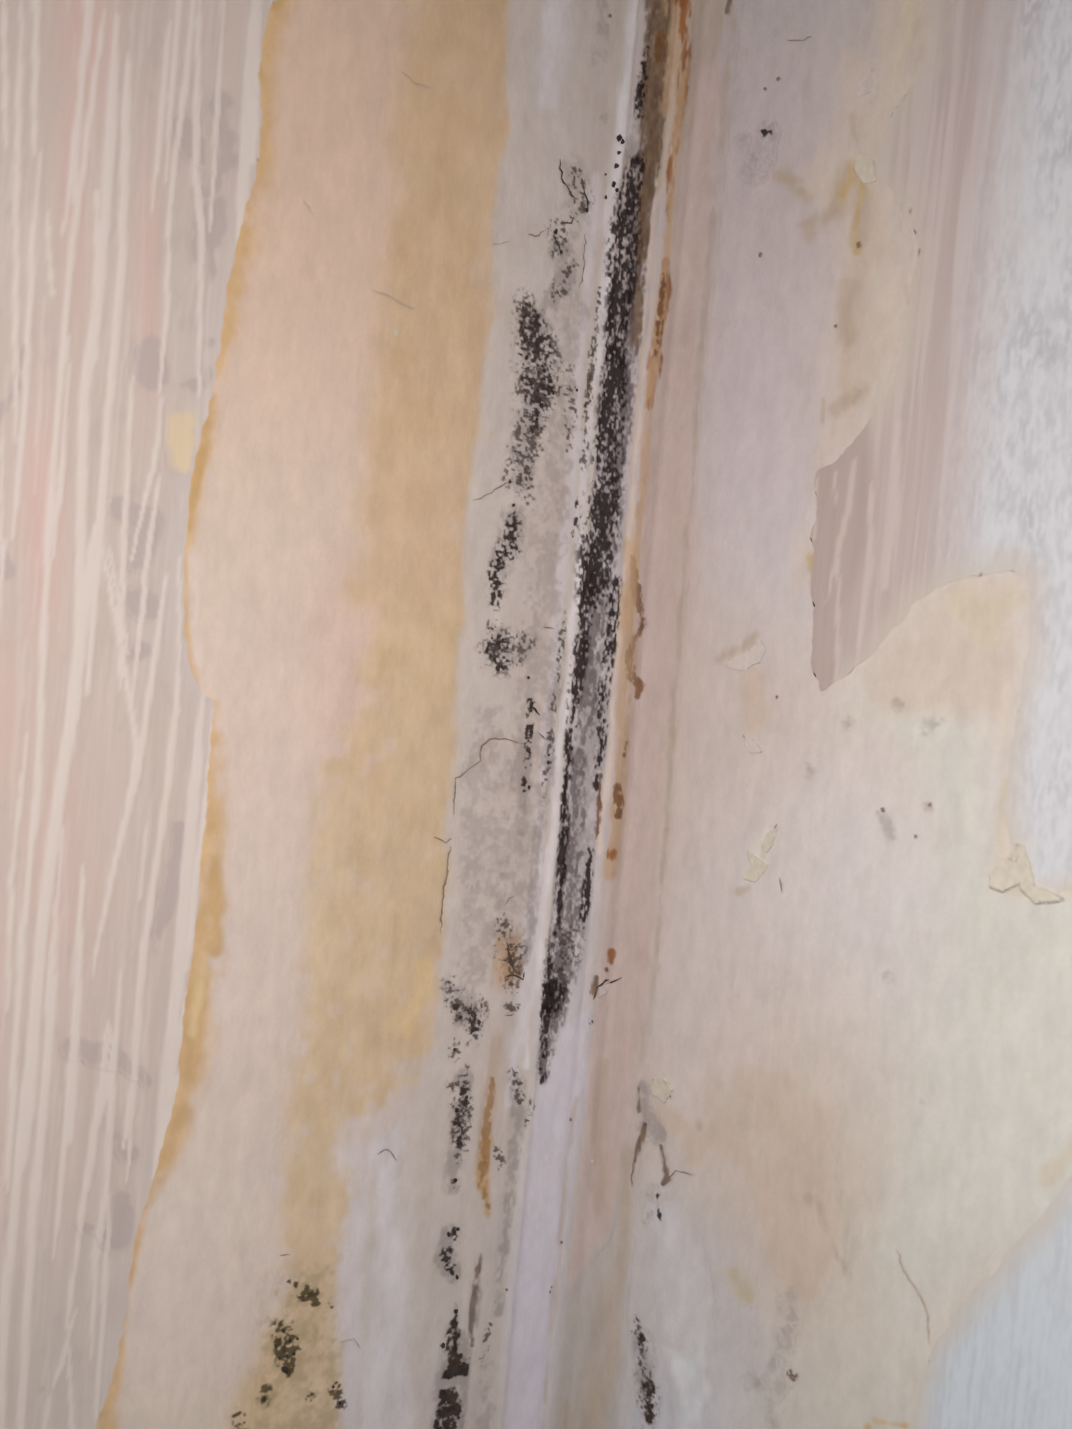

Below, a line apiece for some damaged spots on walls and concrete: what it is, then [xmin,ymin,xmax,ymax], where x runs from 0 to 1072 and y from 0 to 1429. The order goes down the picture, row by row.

damp [74,0,304,1429]
damp [218,0,654,1429]
corrosion [604,947,618,974]
corrosion [593,0,738,885]
damp [553,0,781,1429]